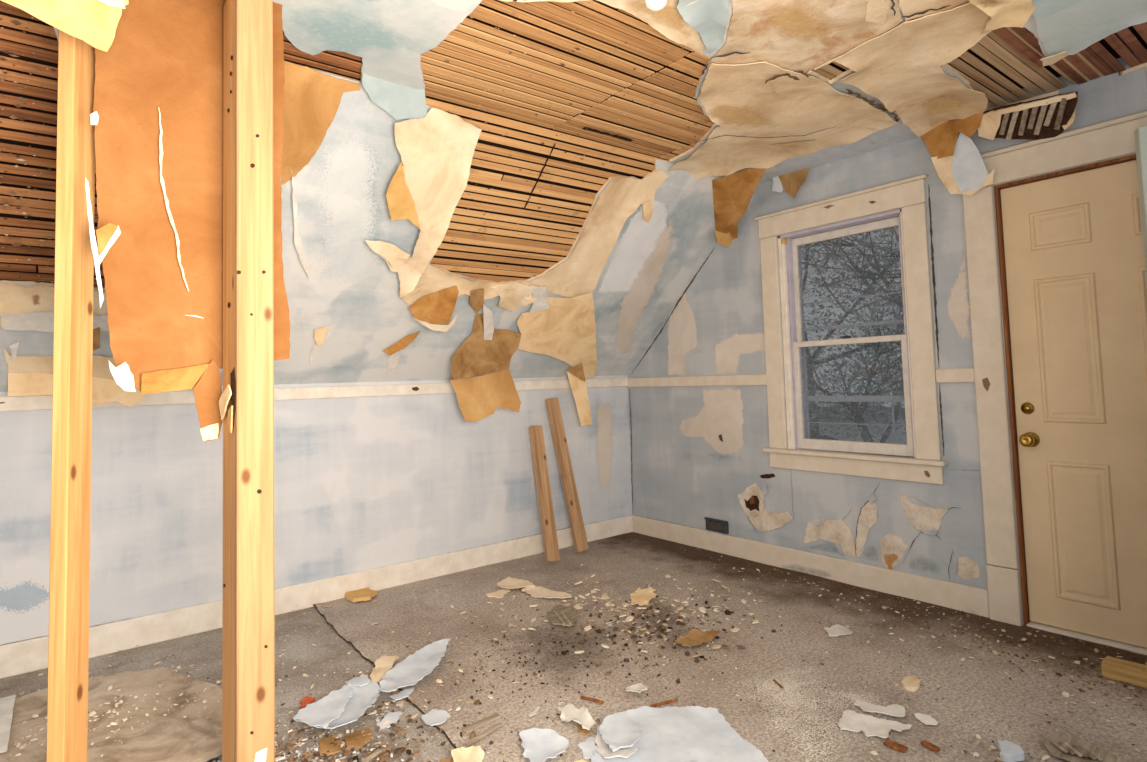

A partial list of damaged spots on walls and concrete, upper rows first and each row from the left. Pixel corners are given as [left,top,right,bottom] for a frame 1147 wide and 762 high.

flaking render [501,0,1035,74]
flaking render [280,61,361,278]
peeling [365,108,669,305]
flaking render [0,284,54,374]
flaking render [93,290,109,331]
peeling [314,326,328,346]
flaking render [92,355,116,380]
peeling [738,474,793,532]
peeling [803,494,908,569]
peeling [900,495,948,535]
peeling [952,557,979,580]